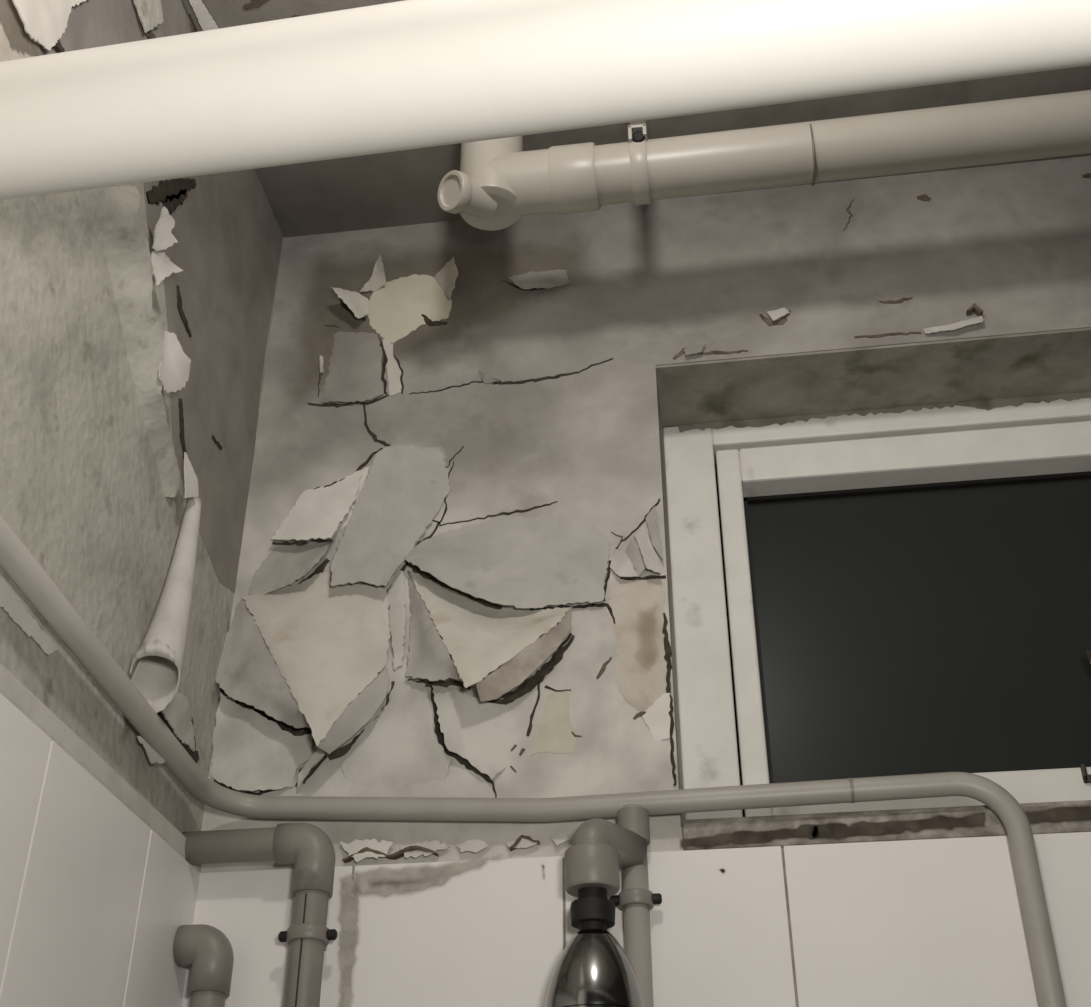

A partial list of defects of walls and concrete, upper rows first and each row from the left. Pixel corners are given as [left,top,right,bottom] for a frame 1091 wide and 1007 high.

peeling [0,0,219,62]
crack [307,358,613,447]
peeling [91,169,677,795]
peeling [339,838,493,863]
peeling [506,833,570,851]